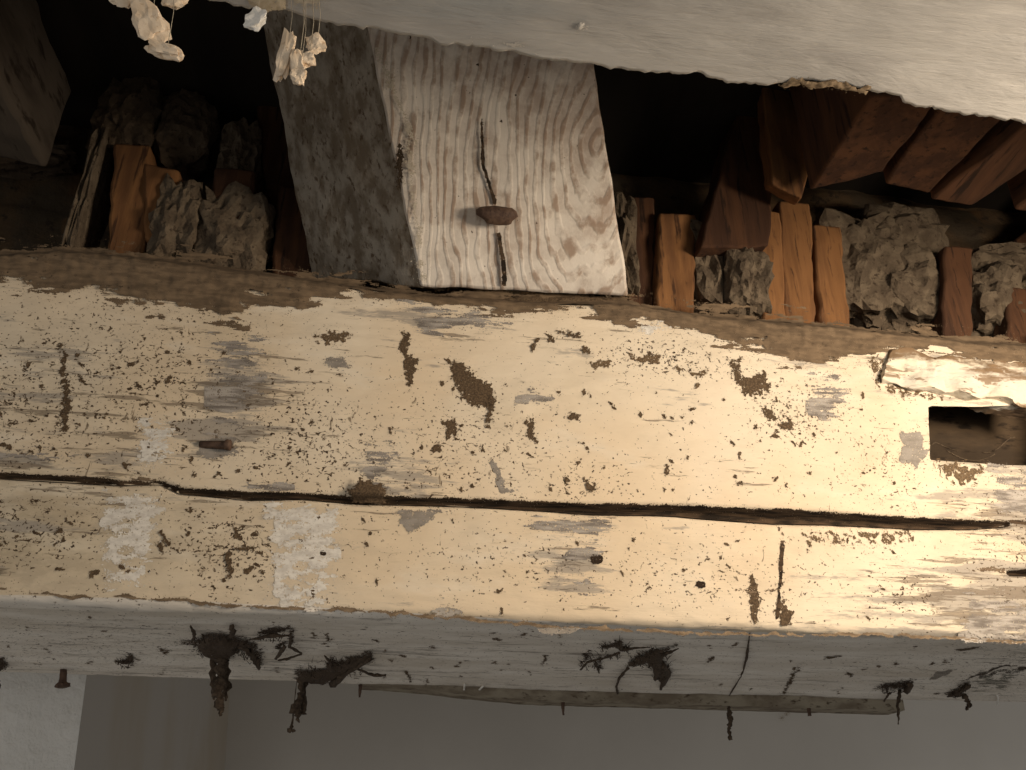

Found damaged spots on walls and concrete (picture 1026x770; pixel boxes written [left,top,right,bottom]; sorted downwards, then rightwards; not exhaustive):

flaking render [109,0,189,62]
flaking render [243,0,327,86]
flaking render [774,77,871,96]
crack [480,119,497,205]
crack [495,232,507,286]
peeling [396,297,513,341]
crack [57,347,74,436]
peeling [753,366,865,449]
peeling [899,431,929,469]
crack [0,470,1026,684]
peeling [523,512,612,611]
peeling [958,587,1026,645]